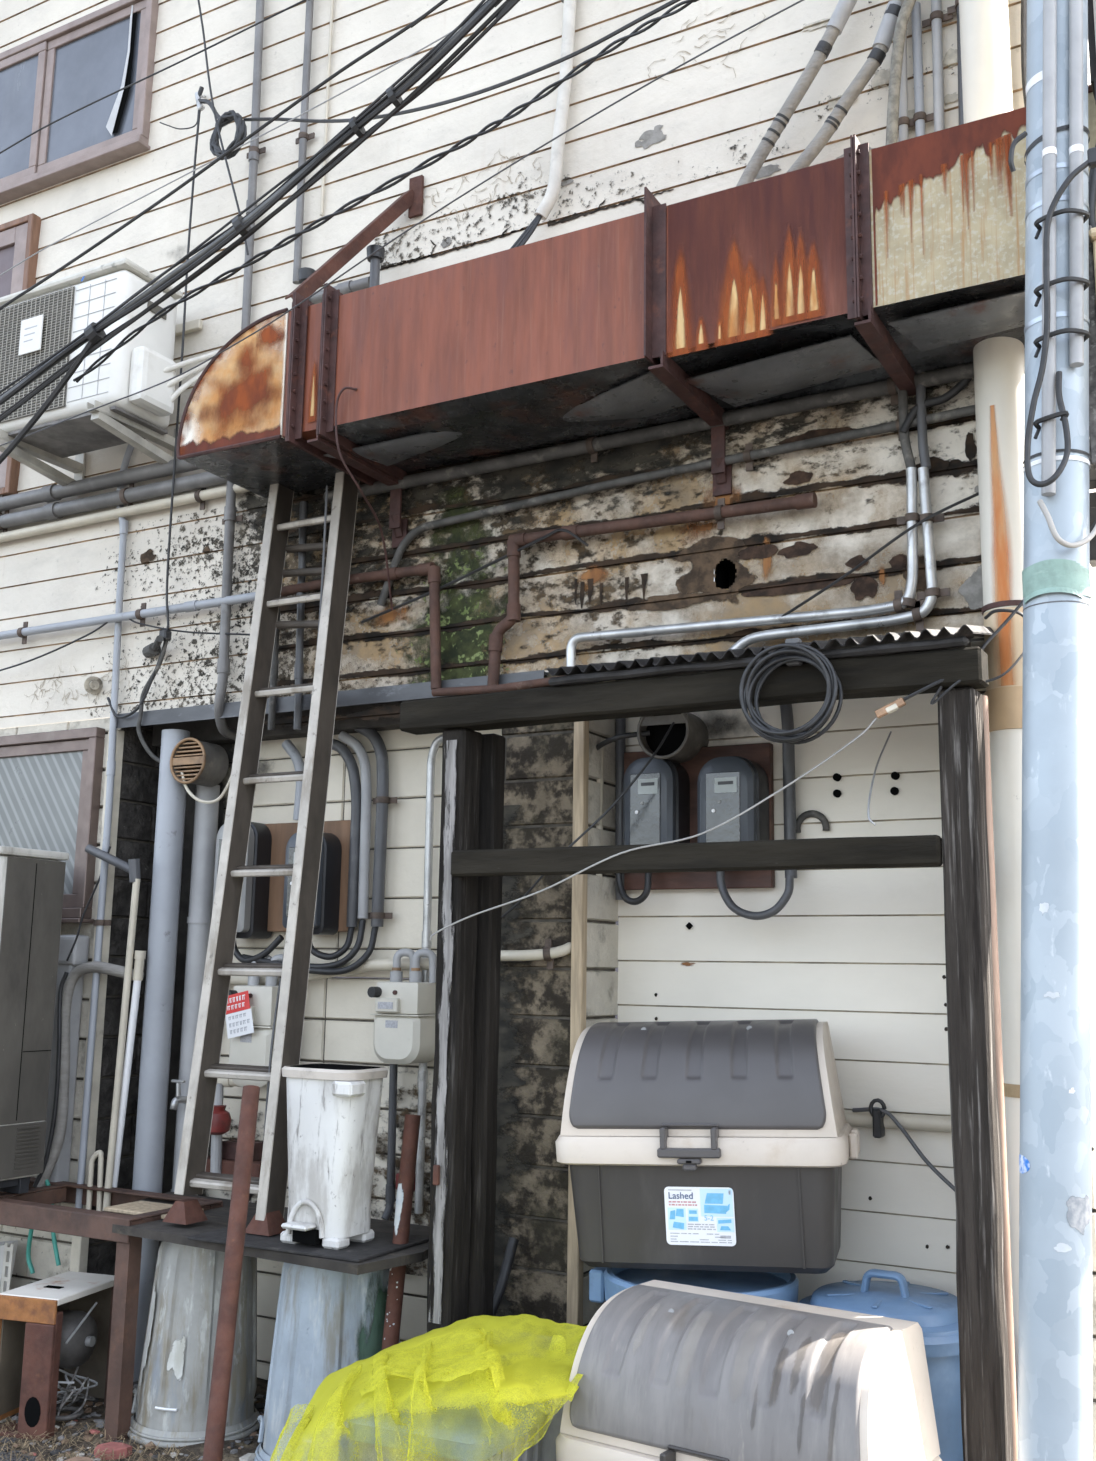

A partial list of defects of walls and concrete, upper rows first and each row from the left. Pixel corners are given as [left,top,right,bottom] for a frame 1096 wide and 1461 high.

corrosion [668,157,846,357]
corrosion [871,107,1026,306]
peeling [140,549,156,565]
damp [85,491,268,716]
corrosion [180,318,284,456]
damp [267,486,334,698]
damp [339,382,954,690]
spalling [627,536,878,611]
spalling [889,554,927,591]
damp [892,430,978,489]
peeling [958,565,983,610]
corrosion [990,405,1013,686]